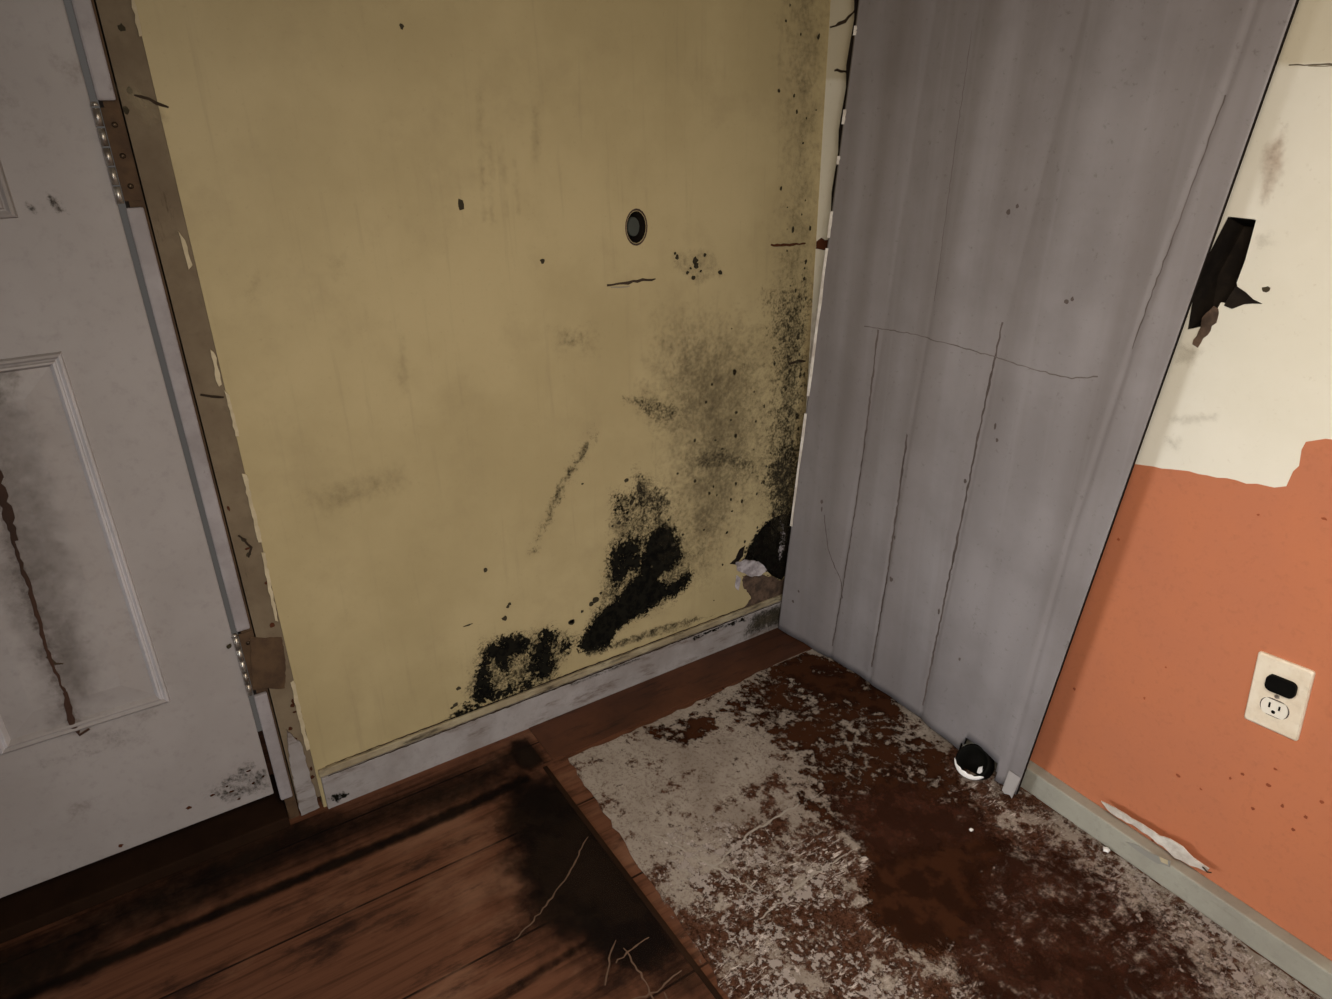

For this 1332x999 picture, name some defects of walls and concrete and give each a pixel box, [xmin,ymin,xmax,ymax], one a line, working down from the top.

leakage [674,252,707,280]
leakage [686,259,812,543]
spalling [1188,217,1270,348]
leakage [449,475,781,719]